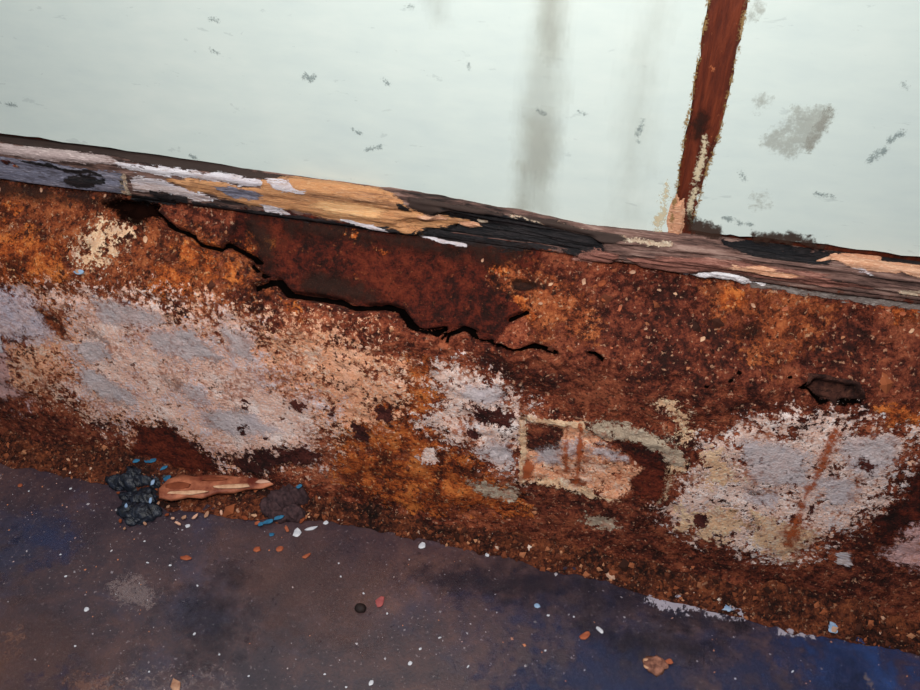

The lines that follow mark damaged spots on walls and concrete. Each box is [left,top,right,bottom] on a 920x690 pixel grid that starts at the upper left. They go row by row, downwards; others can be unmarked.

corrosion [0,394,146,454]
corrosion [0,180,311,343]
crack [160,214,558,354]
peeling [0,207,920,574]
corrosion [327,352,920,623]
corrosion [481,244,920,431]